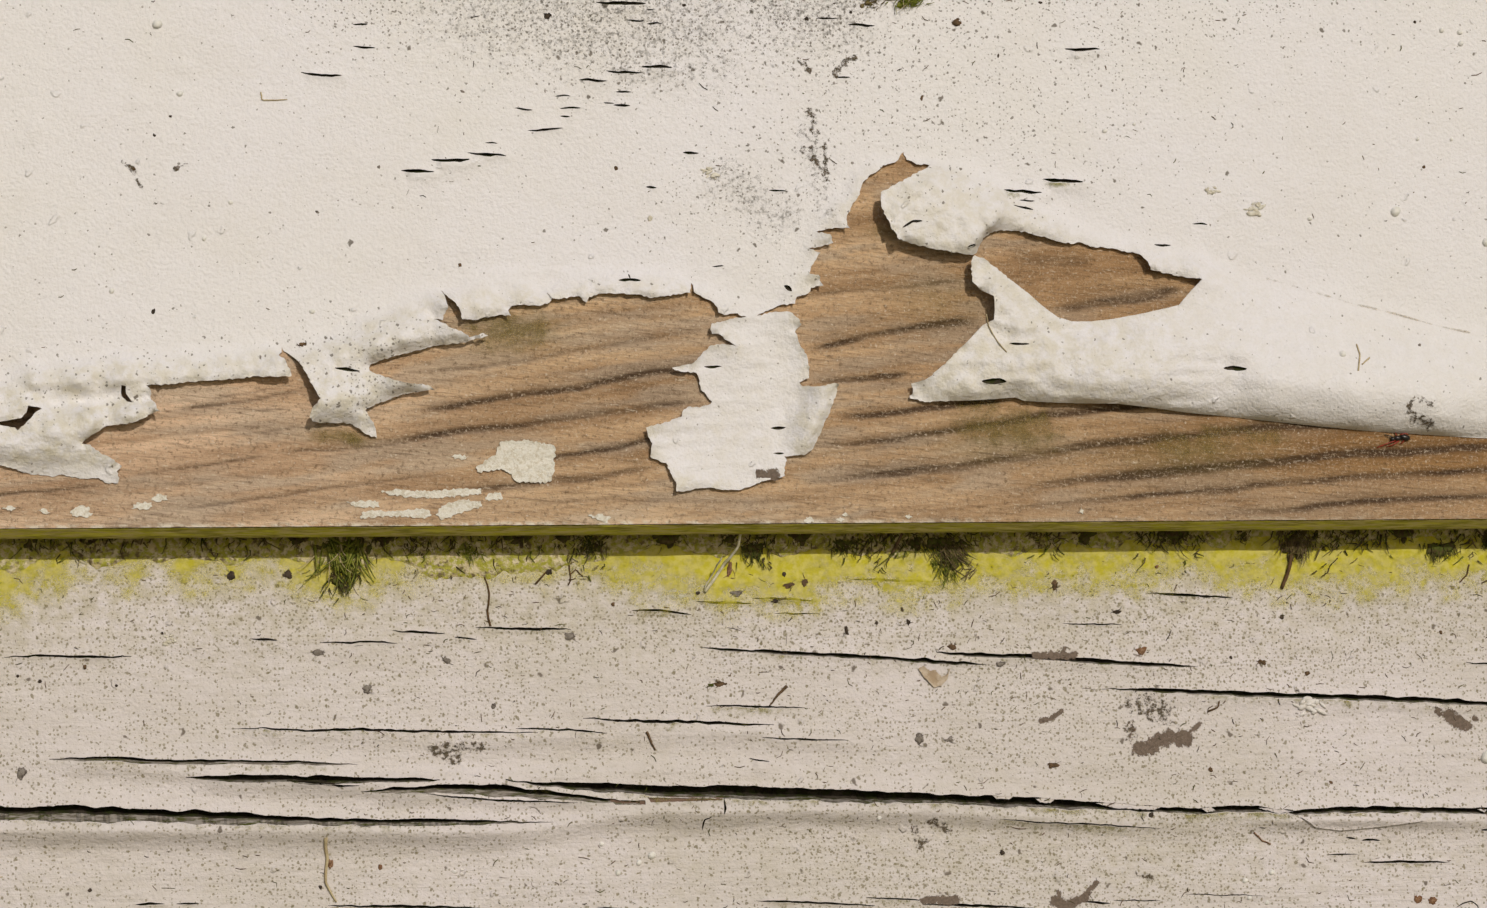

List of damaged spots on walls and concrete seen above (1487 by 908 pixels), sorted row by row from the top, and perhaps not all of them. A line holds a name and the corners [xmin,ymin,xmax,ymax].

peeling [0,152,1487,492]
peeling [70,505,93,518]
peeling [131,494,167,510]
peeling [348,439,556,520]
crack [846,576,900,584]
crack [1147,591,1232,599]
crack [632,597,1487,706]
crack [0,705,1487,864]